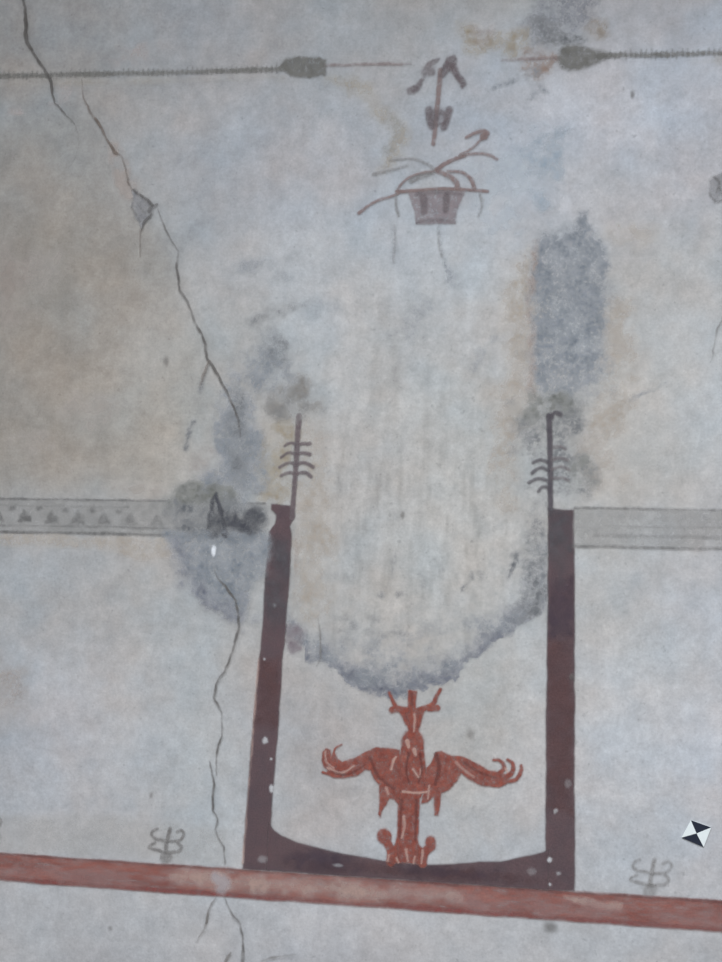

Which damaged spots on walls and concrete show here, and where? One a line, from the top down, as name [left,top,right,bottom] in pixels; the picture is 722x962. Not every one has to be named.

crack [22,0,118,154]
crack [176,262,238,418]
damp [490,215,634,485]
damp [0,387,334,622]
crack [213,582,240,707]
damp [286,519,565,700]
crack [210,736,225,849]
crack [205,901,244,962]